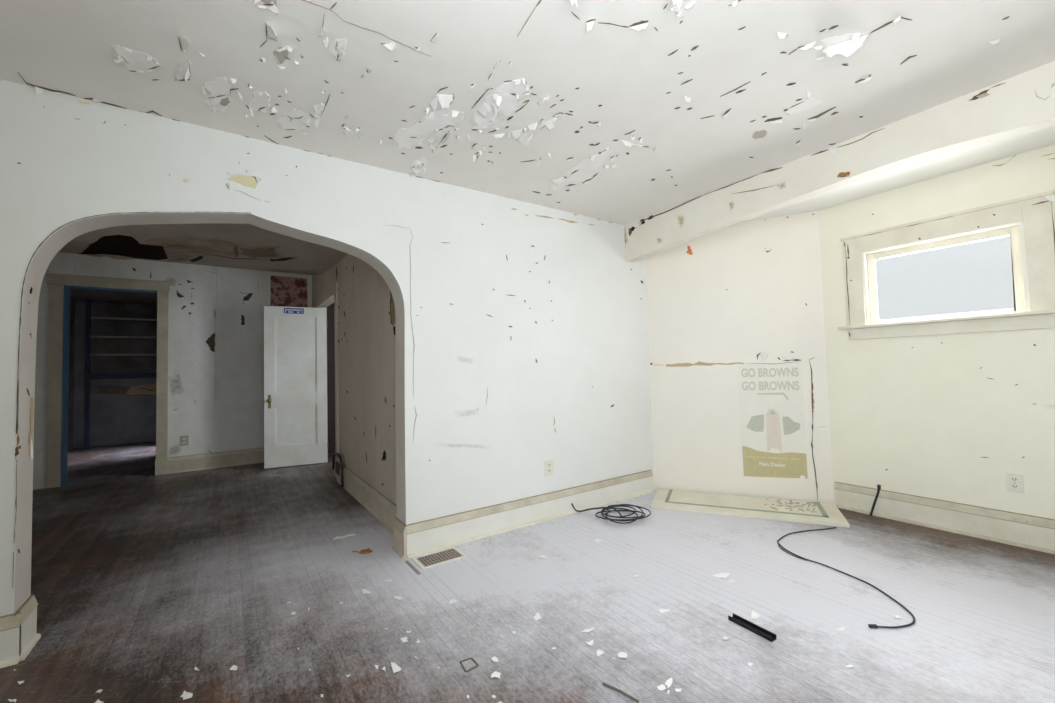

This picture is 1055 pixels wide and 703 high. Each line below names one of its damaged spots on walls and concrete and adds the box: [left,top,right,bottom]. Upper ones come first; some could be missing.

peeling [569,0,658,34]
peeling [663,0,696,24]
peeling [776,16,912,66]
peeling [175,36,343,144]
peeling [378,60,573,182]
peeling [751,91,839,146]
peeling [226,169,268,202]
peeling [511,130,656,226]
spalling [206,332,215,352]
crack [650,357,826,499]